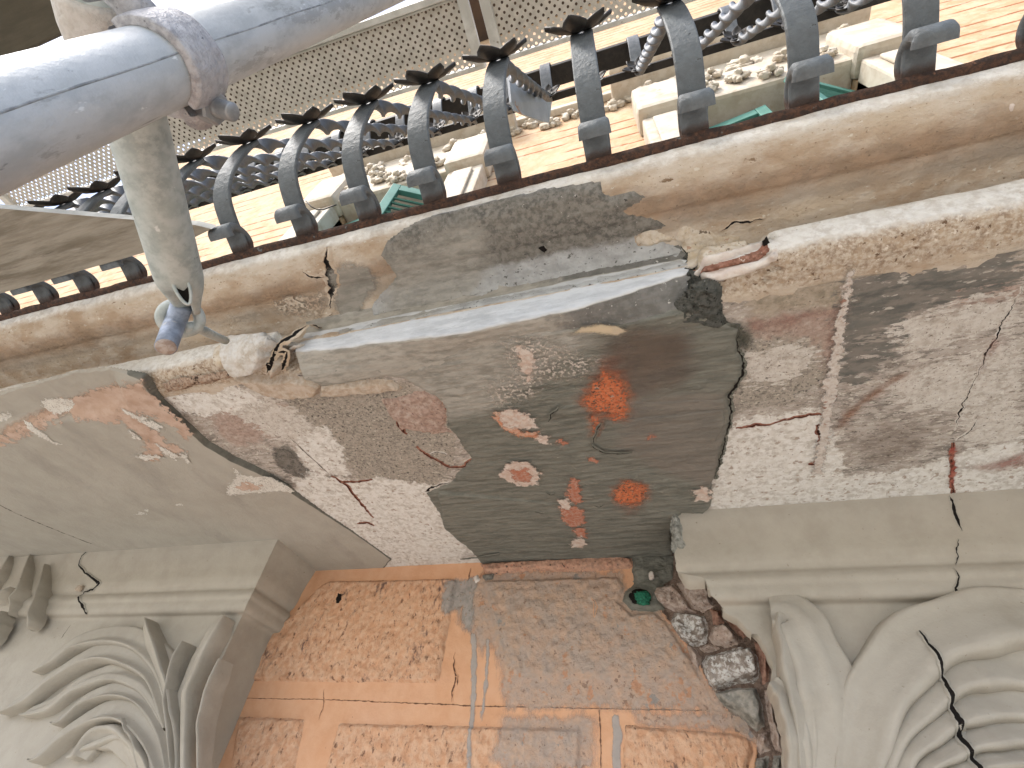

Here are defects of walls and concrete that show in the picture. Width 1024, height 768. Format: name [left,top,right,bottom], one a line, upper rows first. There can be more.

peeling [0,332,452,464]
peeling [225,468,294,496]
crack [265,246,341,374]
crack [286,434,375,526]
flaking render [487,339,601,404]
spalling [636,226,778,282]
crack [713,327,822,479]
corrosion [948,447,958,487]
crack [948,286,1024,592]
crack [0,505,102,638]
leakage [442,570,757,768]
spalling [480,514,782,768]